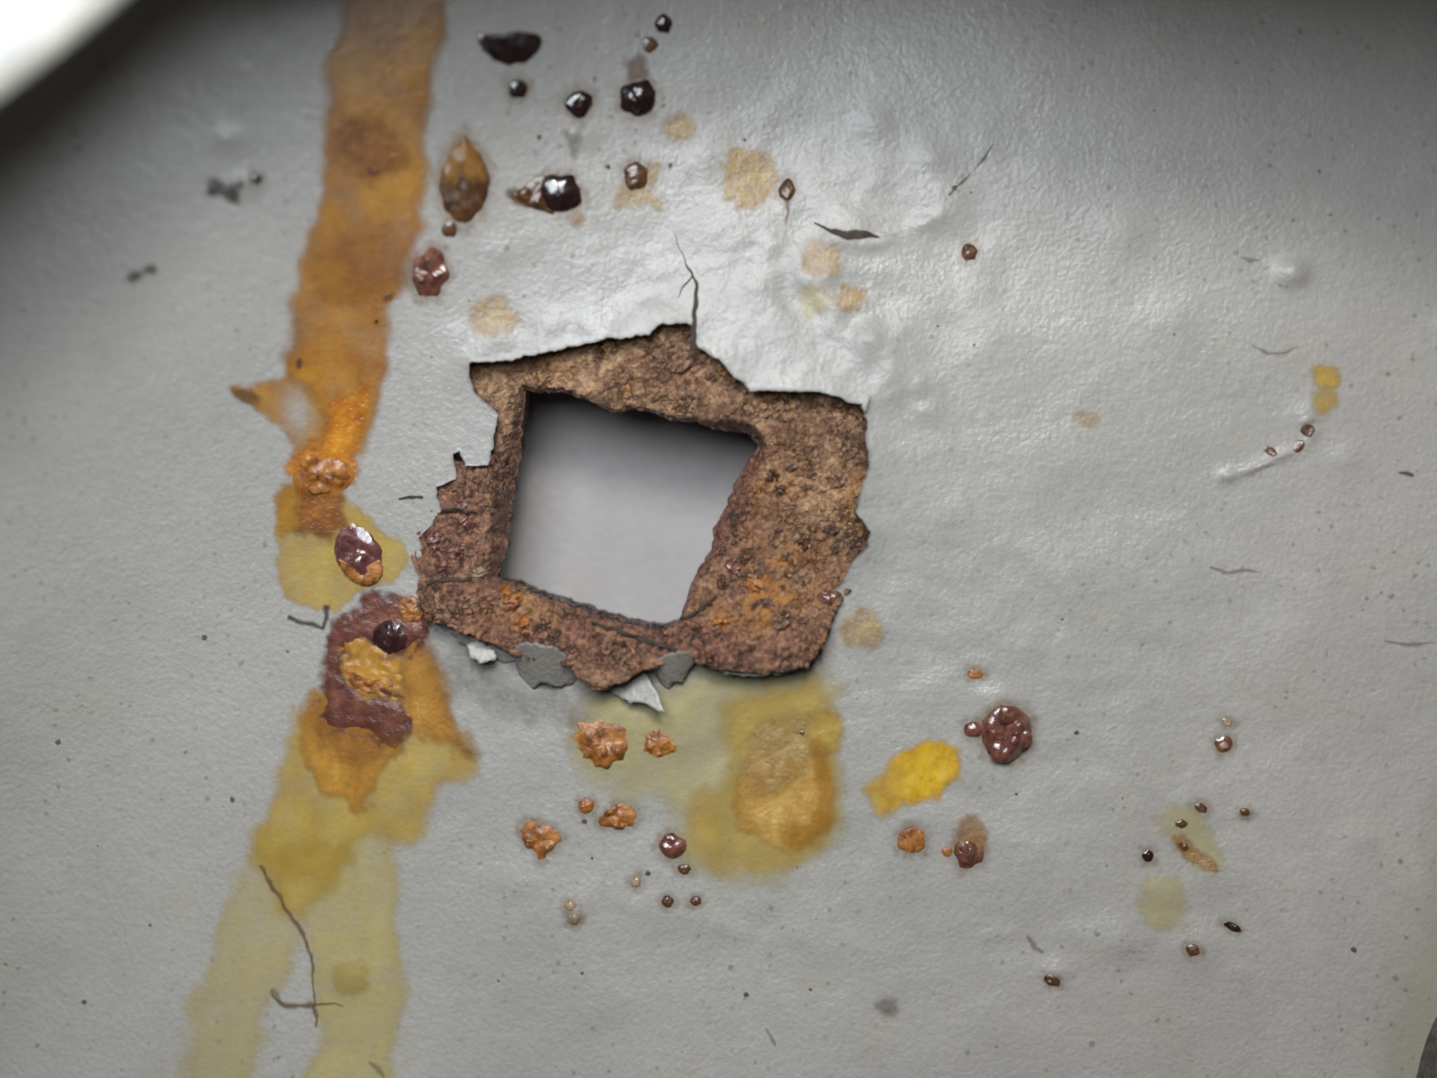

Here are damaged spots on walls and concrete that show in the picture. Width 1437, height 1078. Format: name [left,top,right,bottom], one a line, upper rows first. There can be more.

crack [675,235,699,350]
corrosion [1314,366,1339,412]
corrosion [232,0,881,1078]
corrosion [964,705,1032,763]
corrosion [1214,735,1233,753]
corrosion [868,741,959,815]
corrosion [1168,808,1219,871]